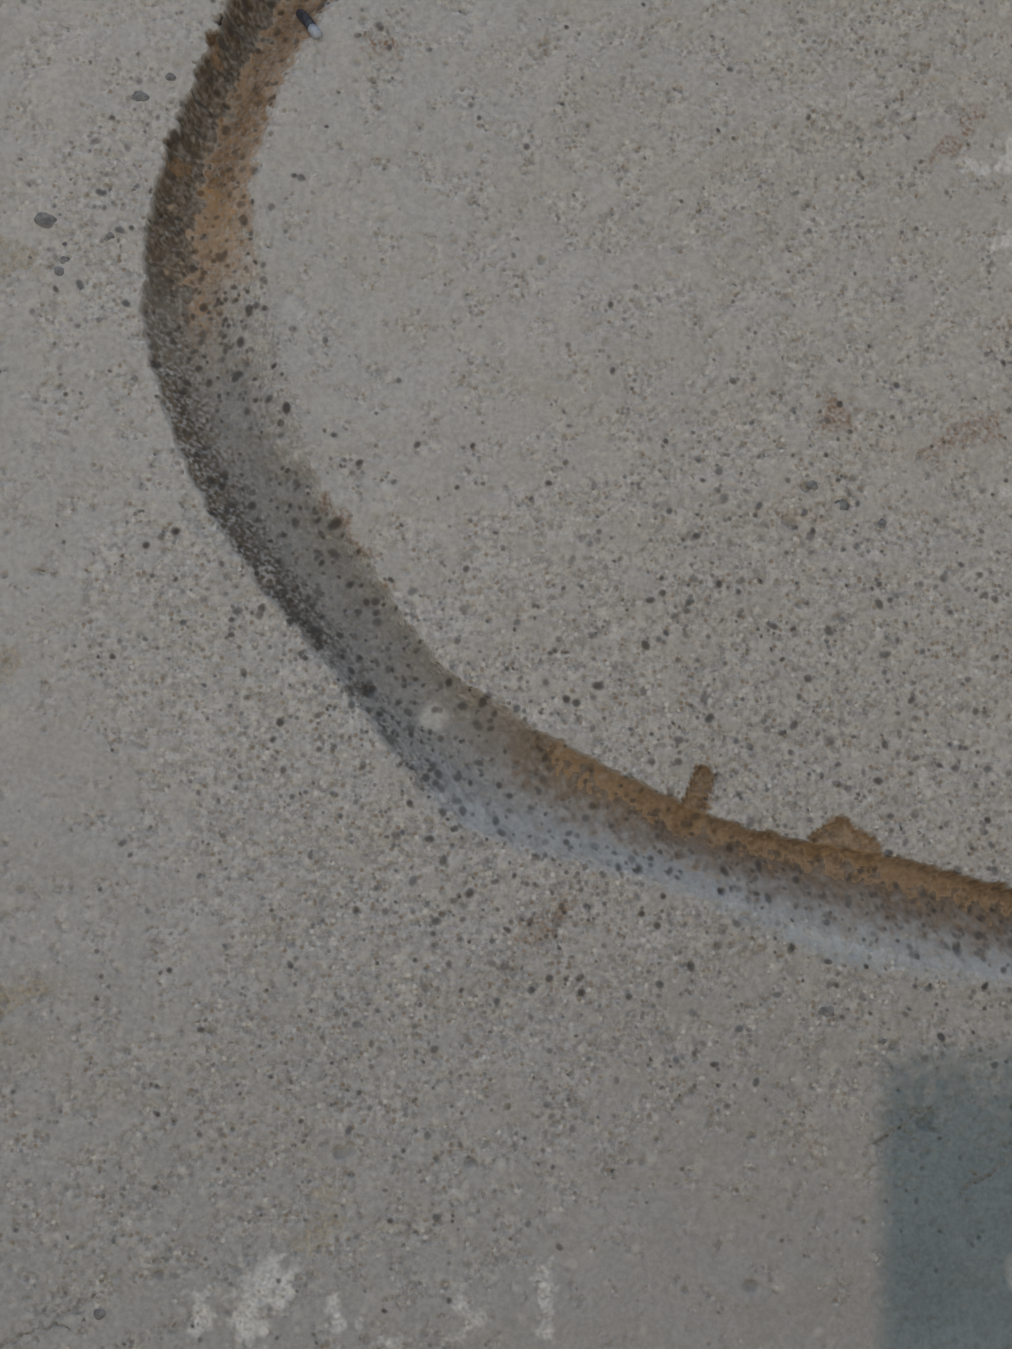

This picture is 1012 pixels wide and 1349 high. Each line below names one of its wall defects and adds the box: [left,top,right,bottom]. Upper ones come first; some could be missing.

spalling [205,29,226,73]
rust [359,26,404,70]
rust [186,0,339,386]
spalling [665,764,717,841]
rust [404,648,1012,962]
spalling [800,814,885,867]